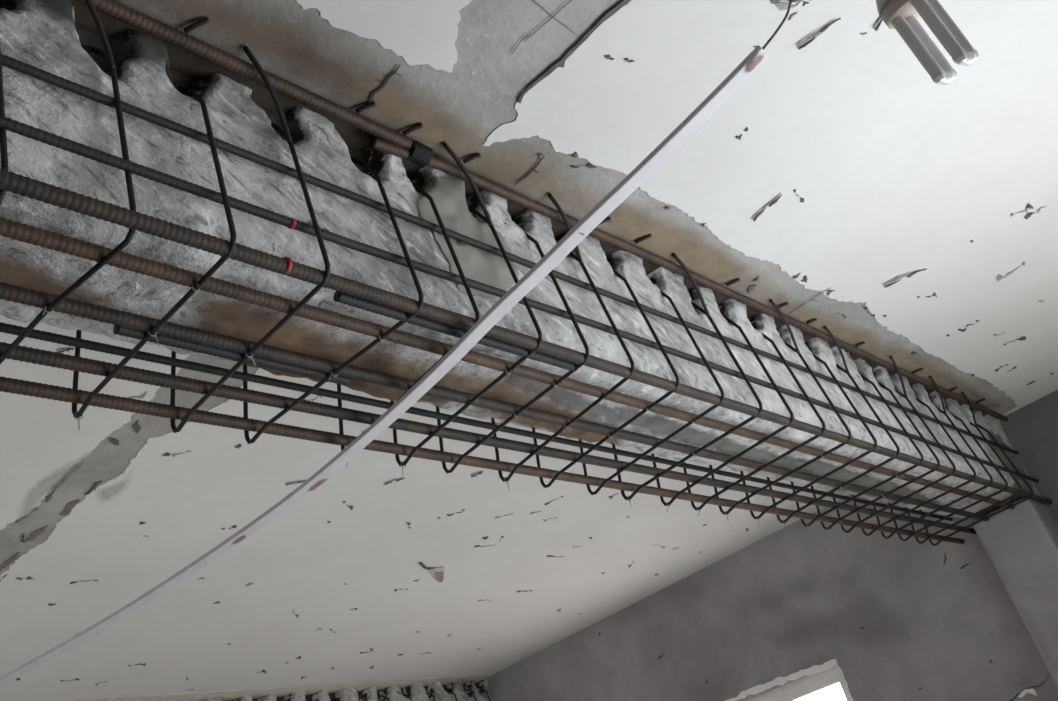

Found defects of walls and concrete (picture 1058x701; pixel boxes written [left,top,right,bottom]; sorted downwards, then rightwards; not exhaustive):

peeling [770,0,809,20]
peeling [796,18,841,50]
spalling [517,0,631,104]
peeling [751,189,804,221]
rust [0,256,102,304]
peeling [883,269,927,288]
spalling [60,480,102,515]
spalling [0,460,84,582]
peeling [394,562,444,592]
crack [1009,677,1049,701]